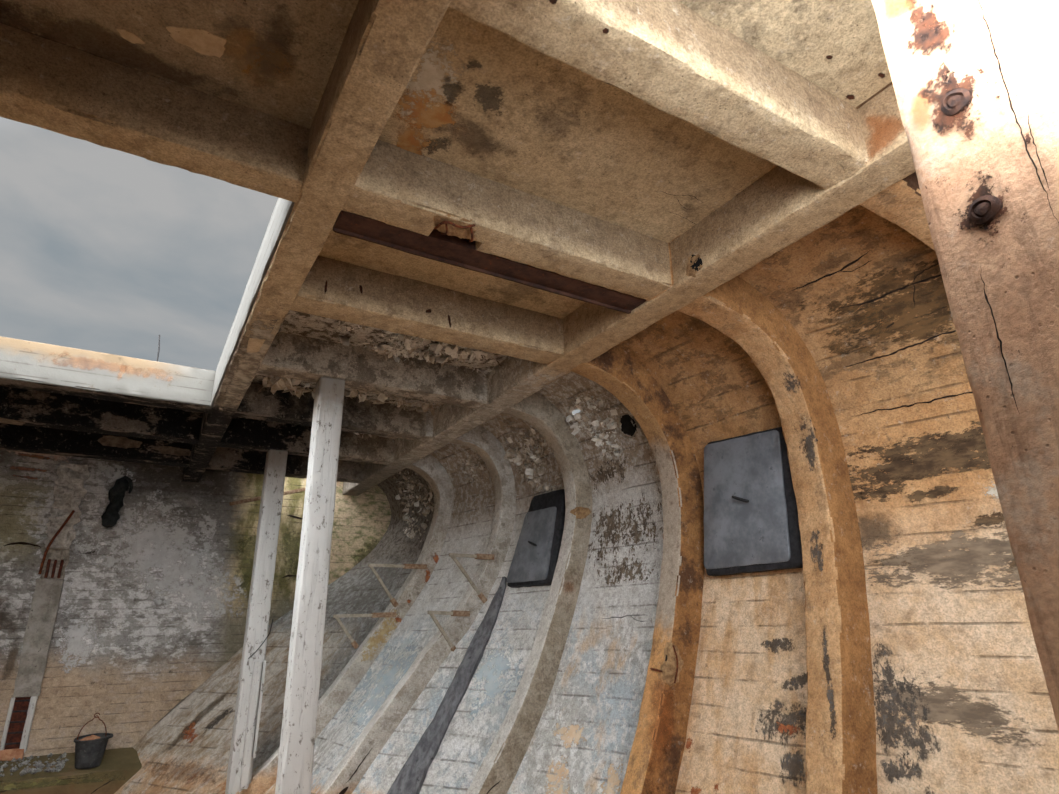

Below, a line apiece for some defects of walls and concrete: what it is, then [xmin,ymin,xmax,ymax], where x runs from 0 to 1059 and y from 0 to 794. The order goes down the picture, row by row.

peeling [166,26,293,85]
rust [868,0,982,155]
crack [977,0,1059,223]
rust [951,171,1010,245]
peeling [332,320,502,378]
crack [980,266,1020,414]
peeling [96,461,135,487]
peeling [98,436,191,456]
mould [760,638,796,653]
water stain [168,695,233,749]
mould [755,673,807,787]
mould [872,643,941,794]